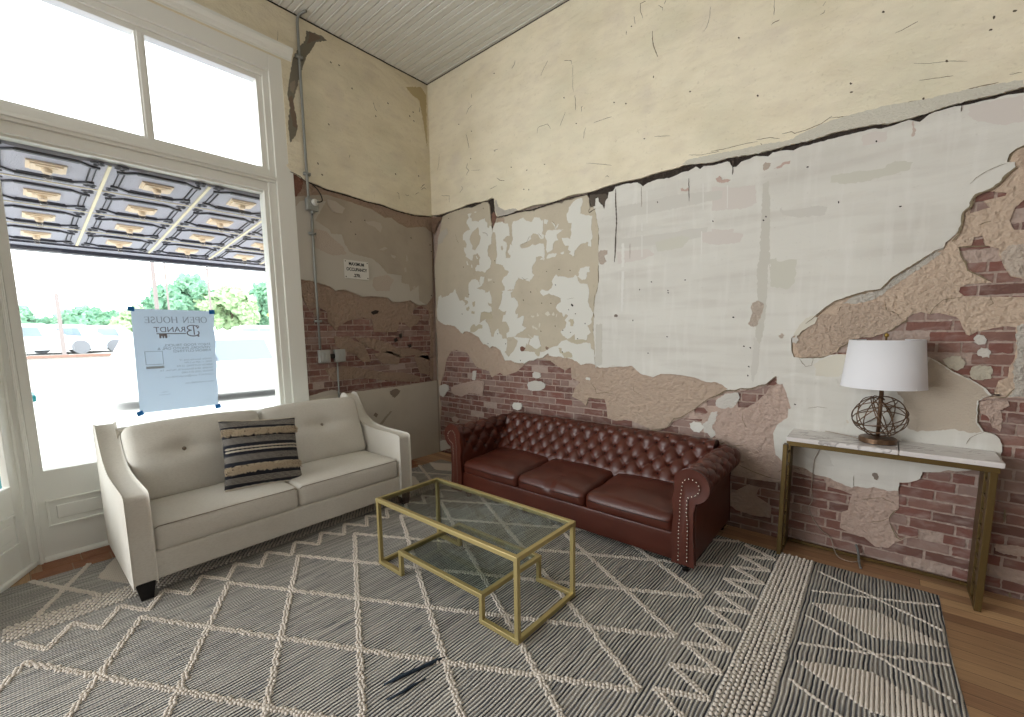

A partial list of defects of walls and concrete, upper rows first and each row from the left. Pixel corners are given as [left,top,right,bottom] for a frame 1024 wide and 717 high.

damp [287,31,327,142]
flaking render [293,174,980,582]
crack [291,60,1024,316]
flaking render [779,148,1024,600]